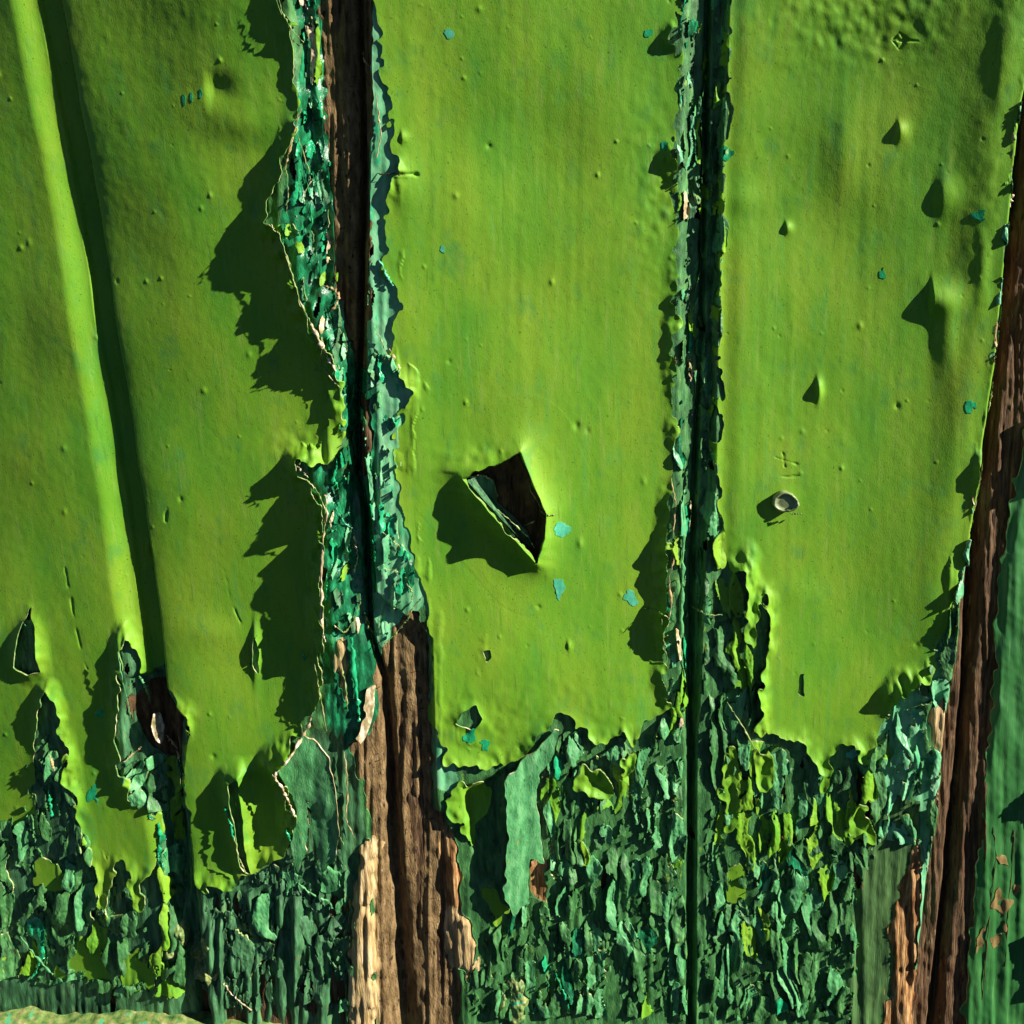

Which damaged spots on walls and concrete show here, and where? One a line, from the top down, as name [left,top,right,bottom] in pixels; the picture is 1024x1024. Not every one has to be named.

peeling [1001,172,1014,246]
peeling [151,712,164,744]
peeling [829,744,858,819]
peeling [536,771,569,908]
peeling [720,827,748,874]
peeling [808,807,833,893]
peeling [459,953,513,1024]
peeling [489,924,501,963]
peeling [534,940,563,1005]
peeling [615,894,651,932]
peeling [735,927,776,989]
peeling [738,874,815,956]